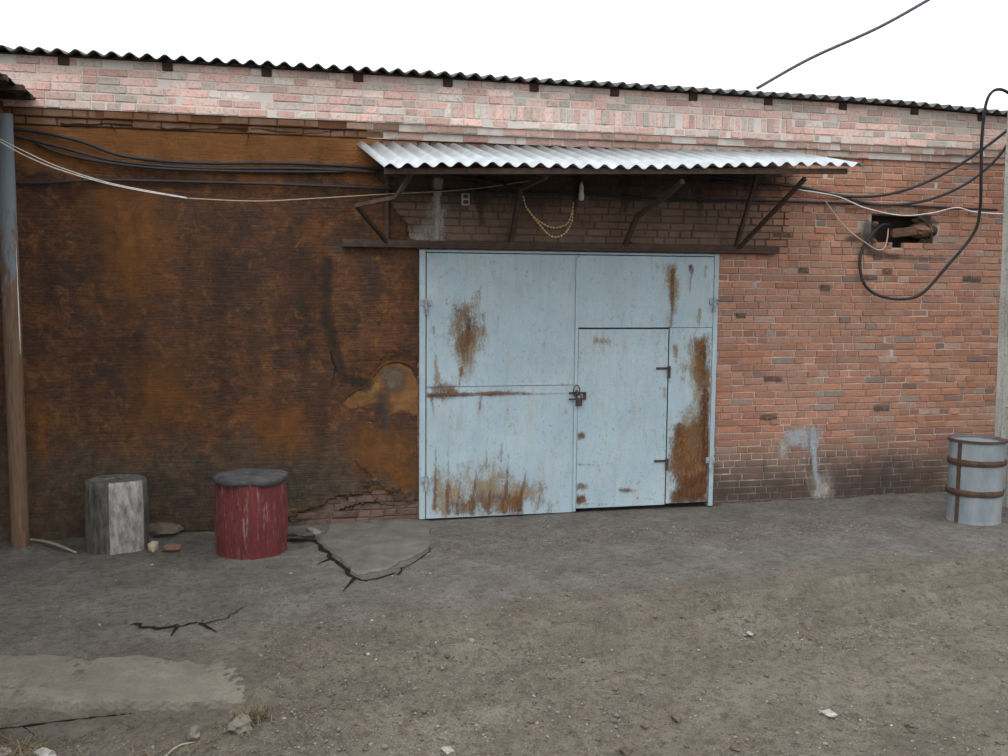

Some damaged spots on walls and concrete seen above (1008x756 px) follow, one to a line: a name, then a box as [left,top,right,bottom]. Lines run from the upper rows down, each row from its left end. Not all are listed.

spalling [864,216,938,280]
rust [427,295,541,410]
peeling [341,360,419,426]
rust [669,336,711,503]
spalling [288,476,417,526]
rust [432,459,550,515]
water stain [757,427,905,498]